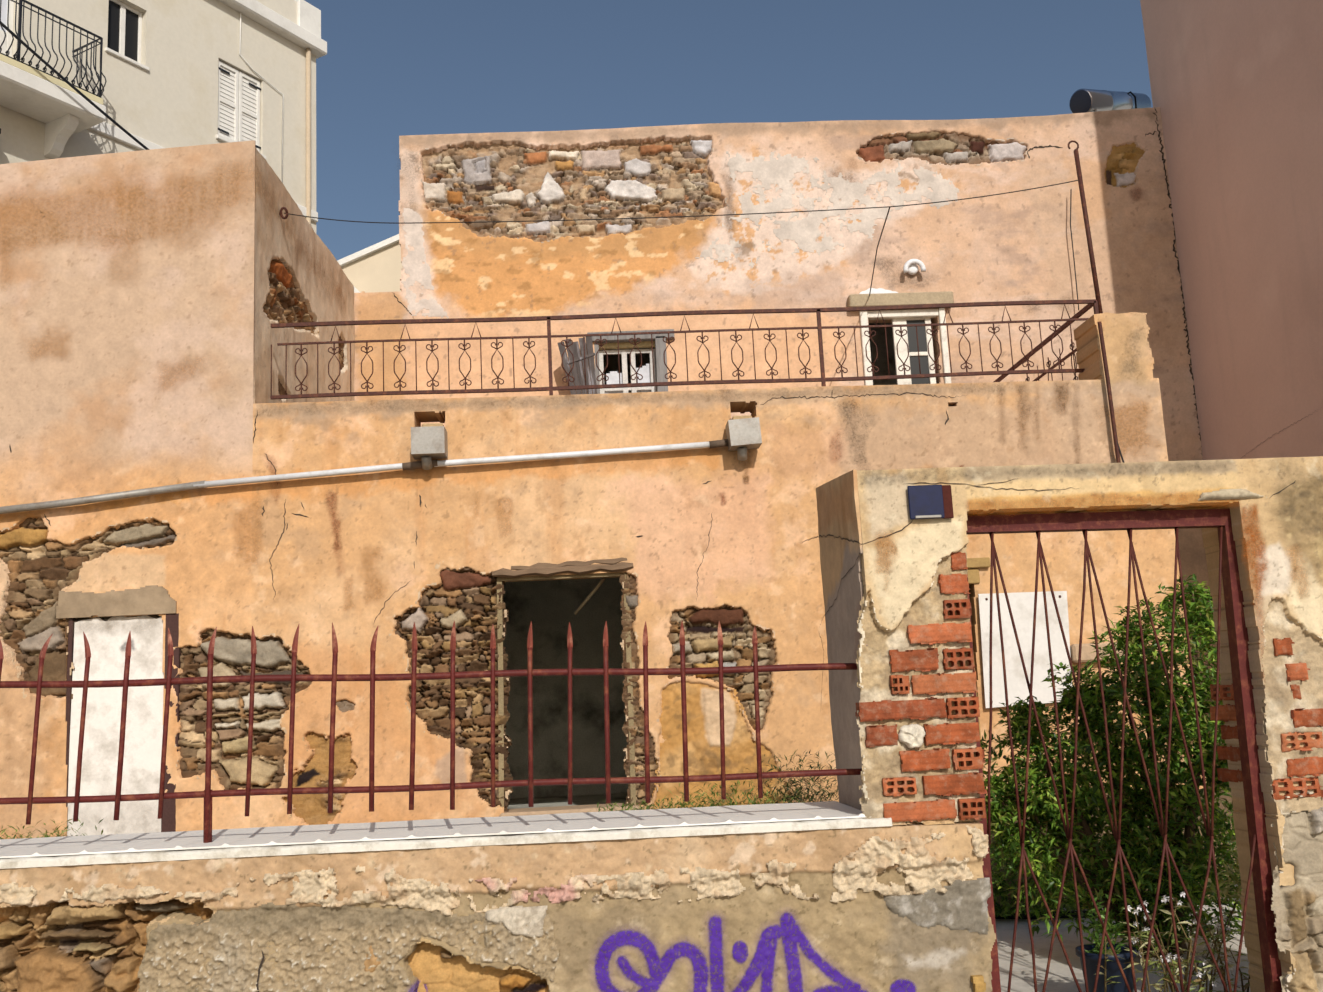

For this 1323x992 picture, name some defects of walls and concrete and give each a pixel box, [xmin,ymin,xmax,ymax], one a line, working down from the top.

spalling [263,257,319,335]
spalling [401,131,1028,319]
crack [1145,109,1203,456]
crack [253,413,286,597]
spalling [0,517,177,700]
flaking render [0,545,991,992]
flaking render [1261,599,1323,992]